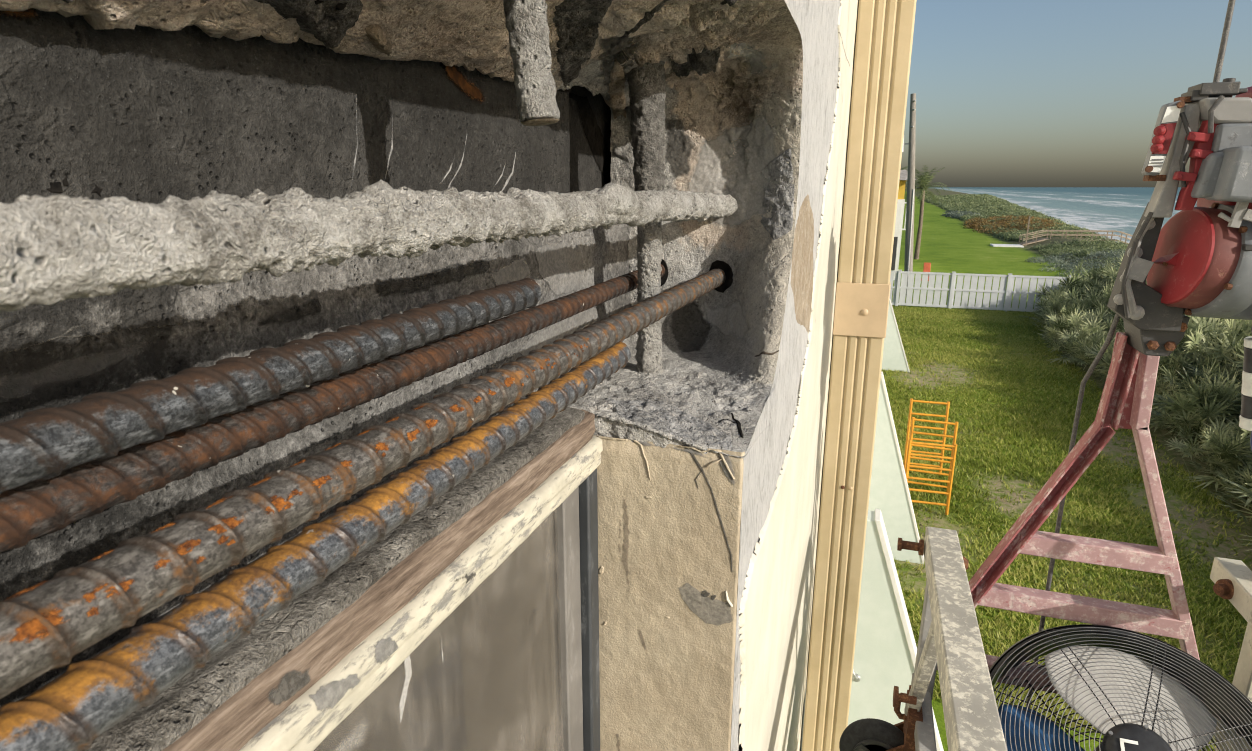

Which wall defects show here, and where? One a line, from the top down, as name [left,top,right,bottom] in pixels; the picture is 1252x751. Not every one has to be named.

spalling [0,0,816,751]